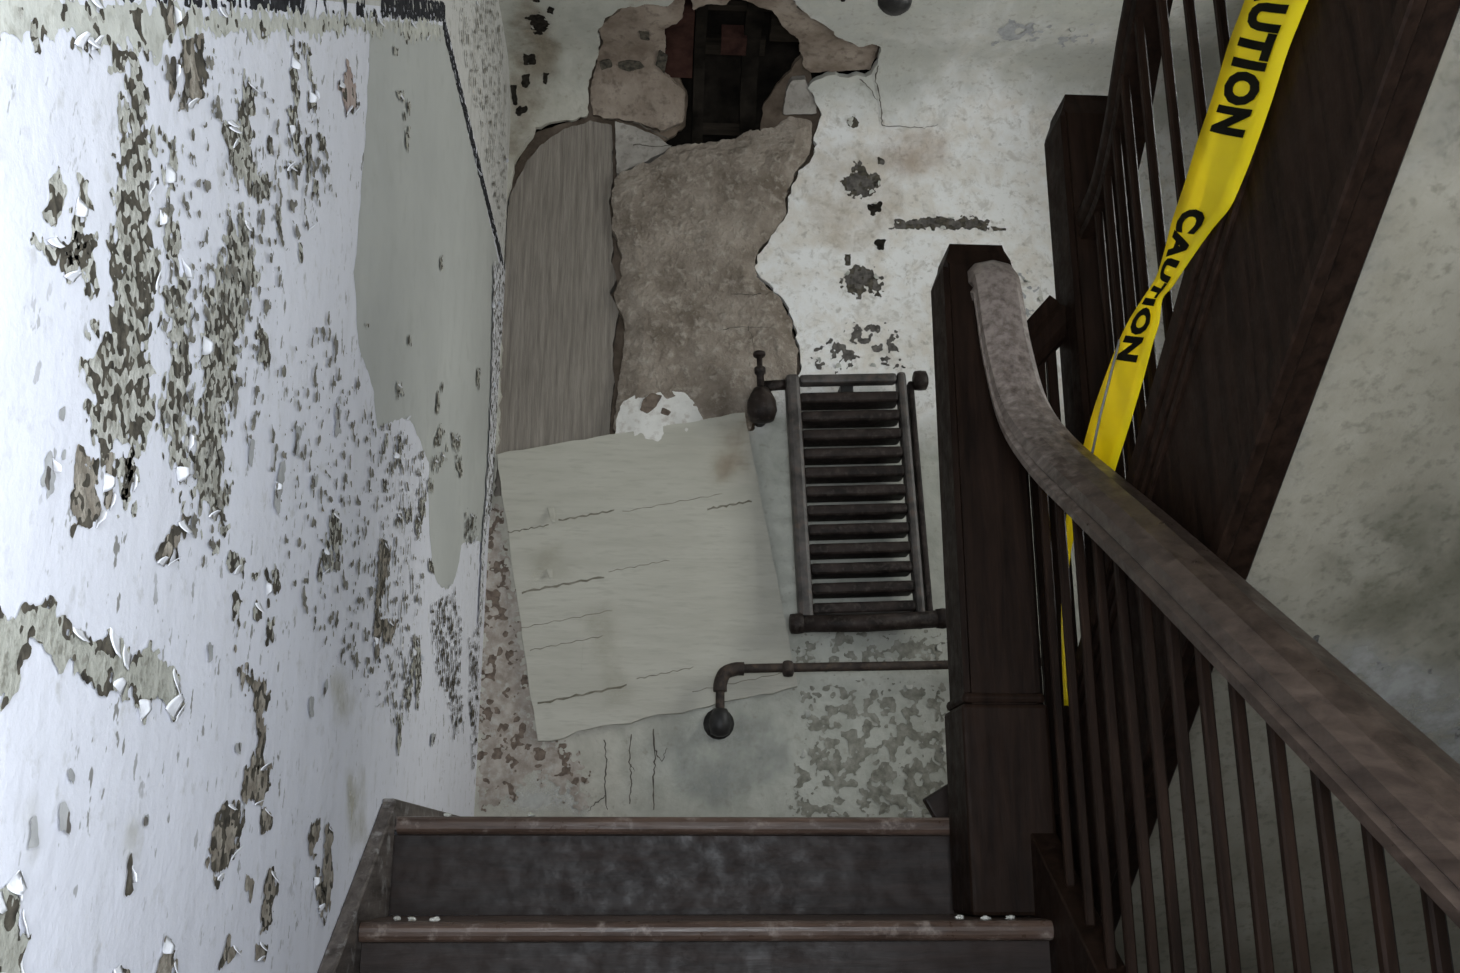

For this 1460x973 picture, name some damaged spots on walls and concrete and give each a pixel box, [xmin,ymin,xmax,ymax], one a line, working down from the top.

peeling [0,0,906,890]
peeling [786,630,949,817]
peeling [0,870,31,973]
peeling [125,853,137,897]
peeling [156,935,178,973]
peeling [219,866,279,971]
peeling [308,818,334,926]